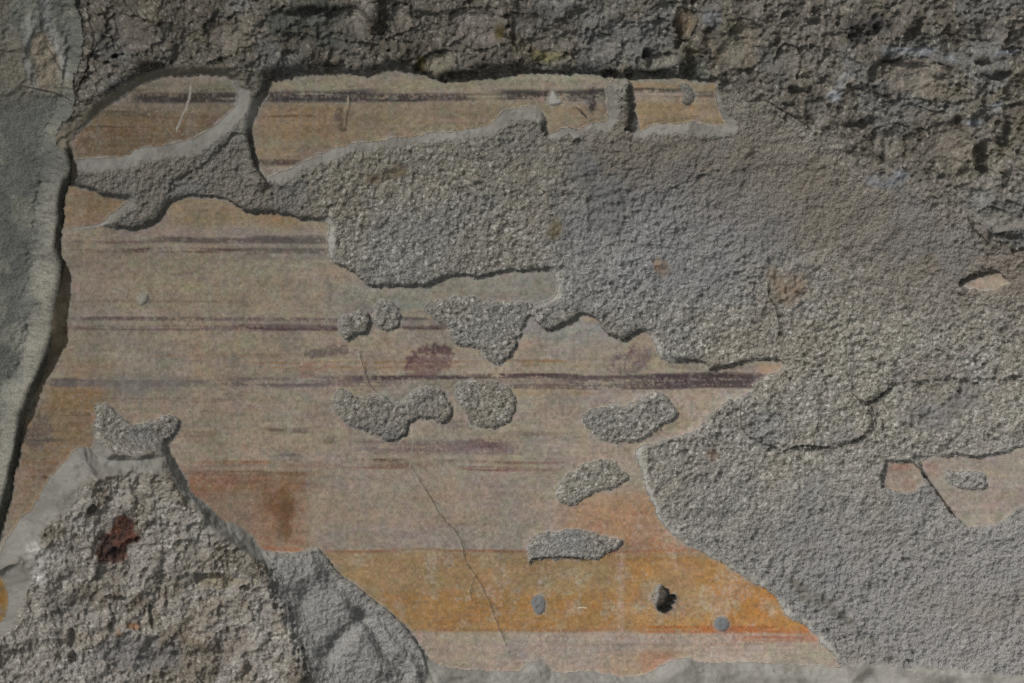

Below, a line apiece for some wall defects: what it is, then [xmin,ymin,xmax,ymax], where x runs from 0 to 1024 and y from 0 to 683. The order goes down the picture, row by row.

spalling [70,79,287,231]
spalling [266,78,1024,676]
crack [416,474,507,648]
spalling [0,403,1024,683]